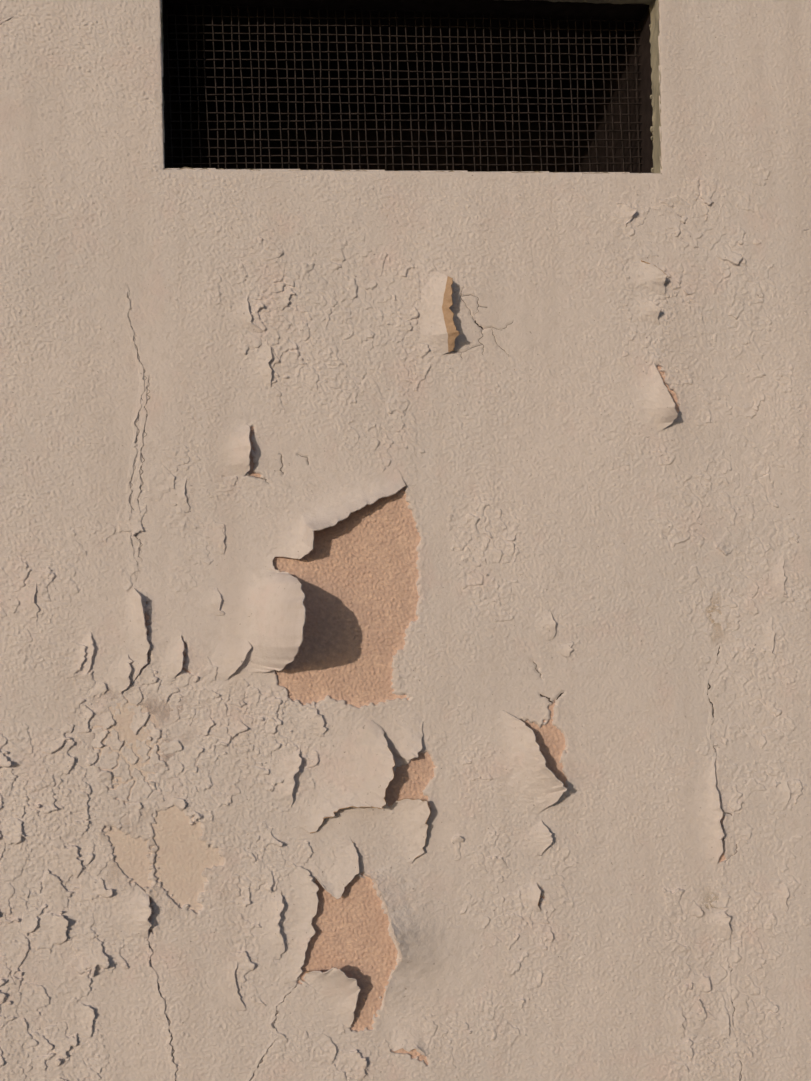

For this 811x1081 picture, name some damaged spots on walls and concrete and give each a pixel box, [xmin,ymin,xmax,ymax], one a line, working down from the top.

crack [453,290,513,358]
peeling [618,260,668,325]
crack [123,284,151,581]
peeling [634,362,679,432]
peeling [0,227,527,1081]
crack [703,643,721,754]
peeling [479,700,567,856]
peeling [692,753,725,865]
peeling [696,911,732,940]
crack [145,936,178,1081]
peeling [661,1005,730,1043]